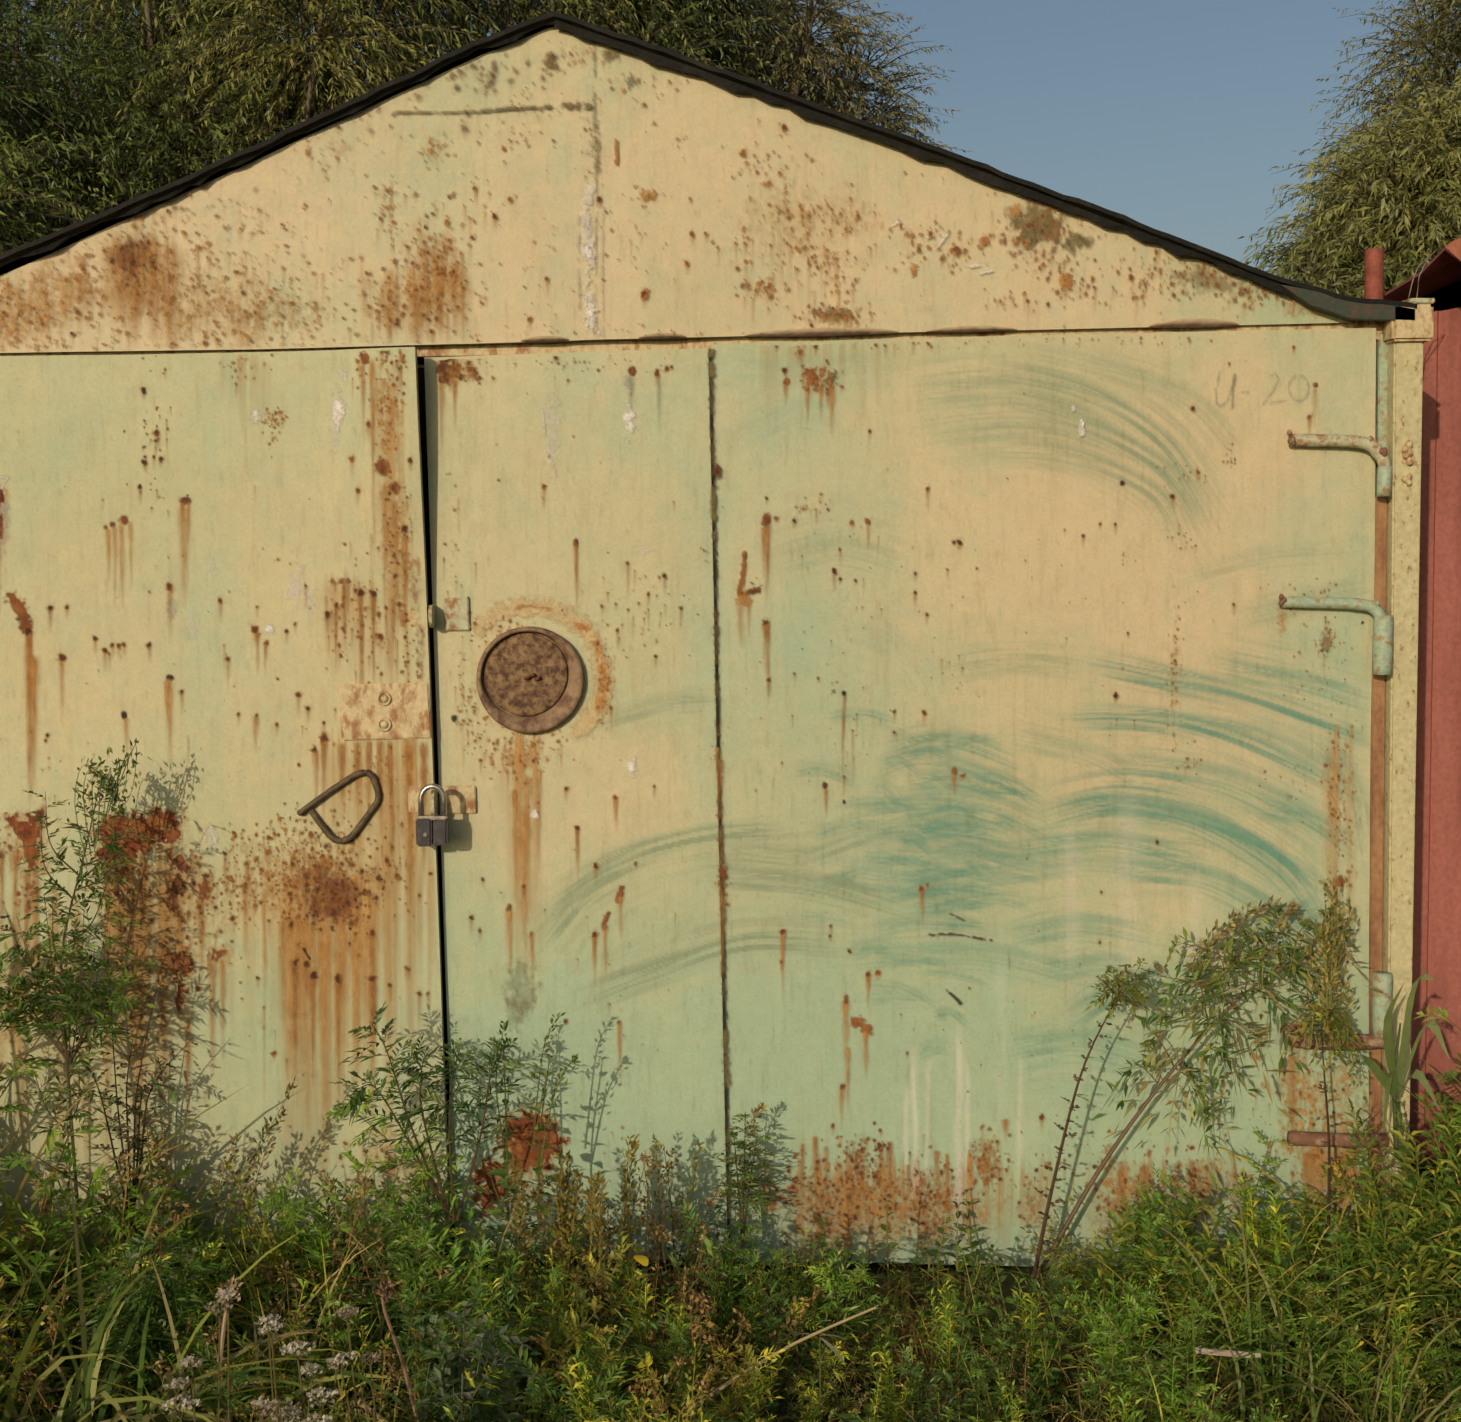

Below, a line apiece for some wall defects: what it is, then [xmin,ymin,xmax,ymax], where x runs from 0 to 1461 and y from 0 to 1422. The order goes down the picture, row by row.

rust [0,209,210,351]
rust [324,174,484,683]
rust [436,359,494,395]
rust [451,596,619,956]
rust [200,692,432,1057]
rust [592,886,624,962]
rust [840,995,872,1100]